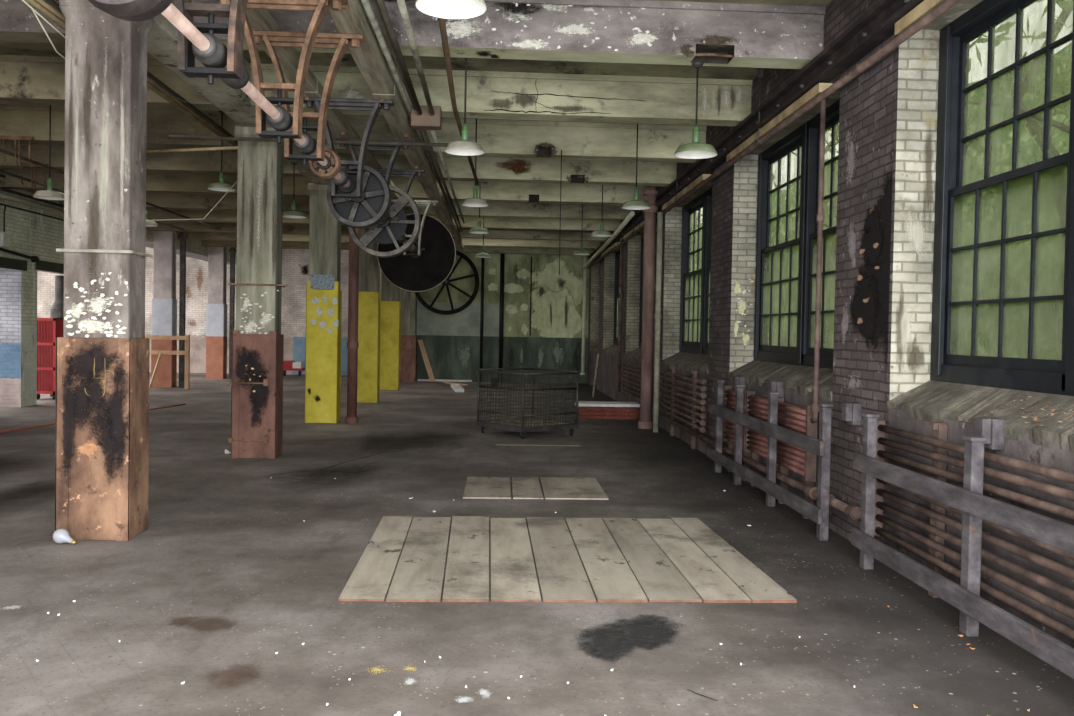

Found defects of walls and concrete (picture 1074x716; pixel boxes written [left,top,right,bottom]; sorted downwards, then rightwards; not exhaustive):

peeling [446,3,618,51]
peeling [628,8,658,47]
peeling [844,131,856,194]
peeling [847,223,879,281]
peeling [64,272,128,338]
peeling [240,290,279,334]
peeling [310,295,339,334]
peeling [840,301,863,345]
rust [78,441,98,459]